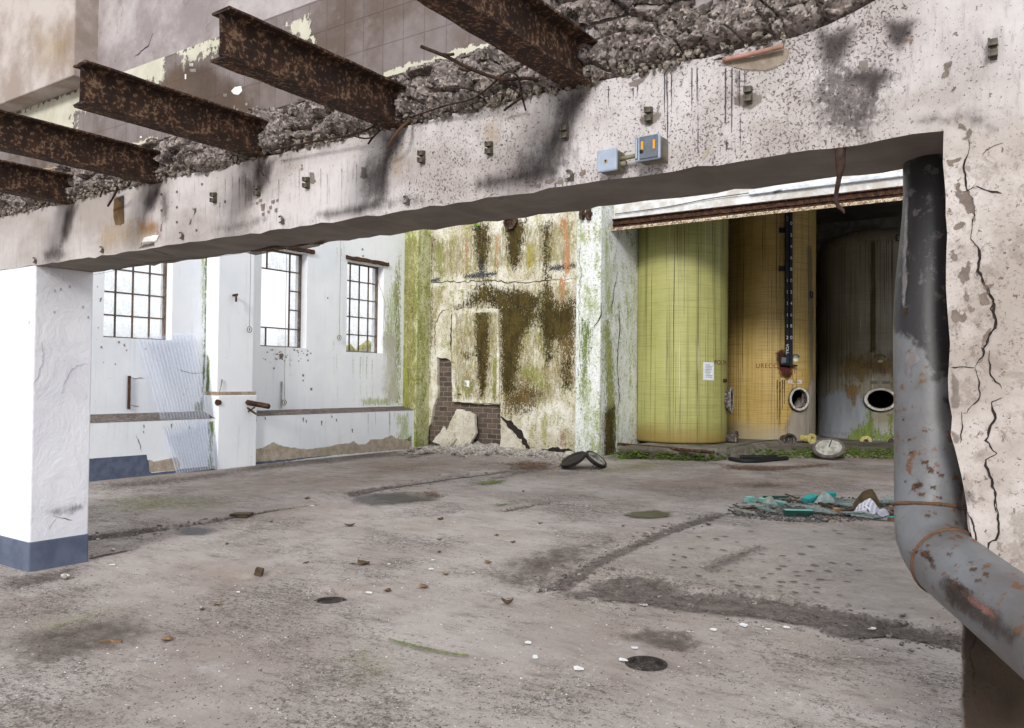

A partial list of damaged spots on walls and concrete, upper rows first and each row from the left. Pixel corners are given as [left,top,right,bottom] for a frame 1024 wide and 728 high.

spalling [0,0,875,218]
water stain [431,241,446,283]
water stain [463,257,500,279]
crack [952,142,1002,549]
peeling [149,457,180,472]
peeling [256,435,411,462]
rust [904,439,944,499]
rust [944,562,1015,640]